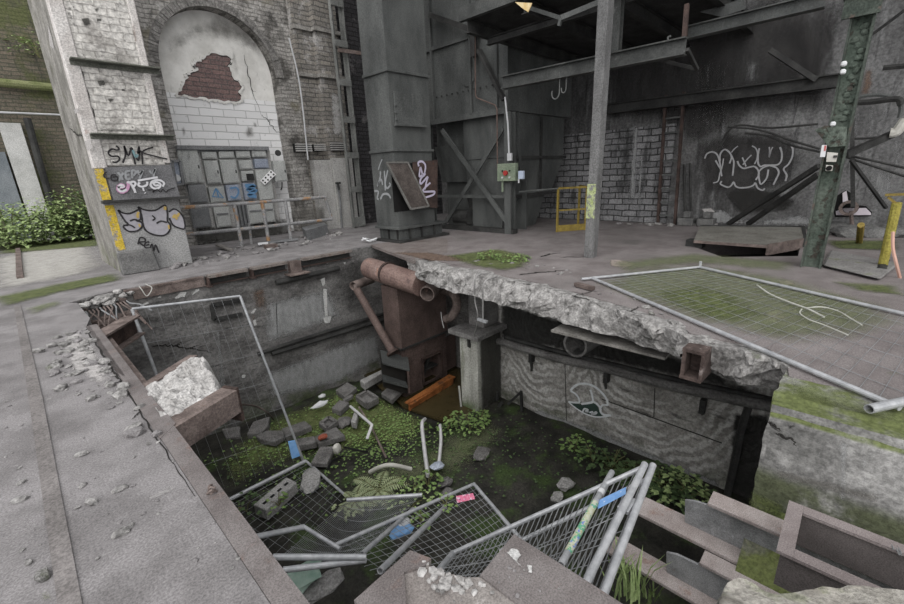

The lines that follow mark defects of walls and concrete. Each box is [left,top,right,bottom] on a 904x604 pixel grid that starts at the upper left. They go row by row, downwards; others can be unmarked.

flaking render [175,49,245,105]
crack [244,58,280,133]
spalling [407,258,790,389]
spalling [32,334,127,402]
crack [88,333,195,496]